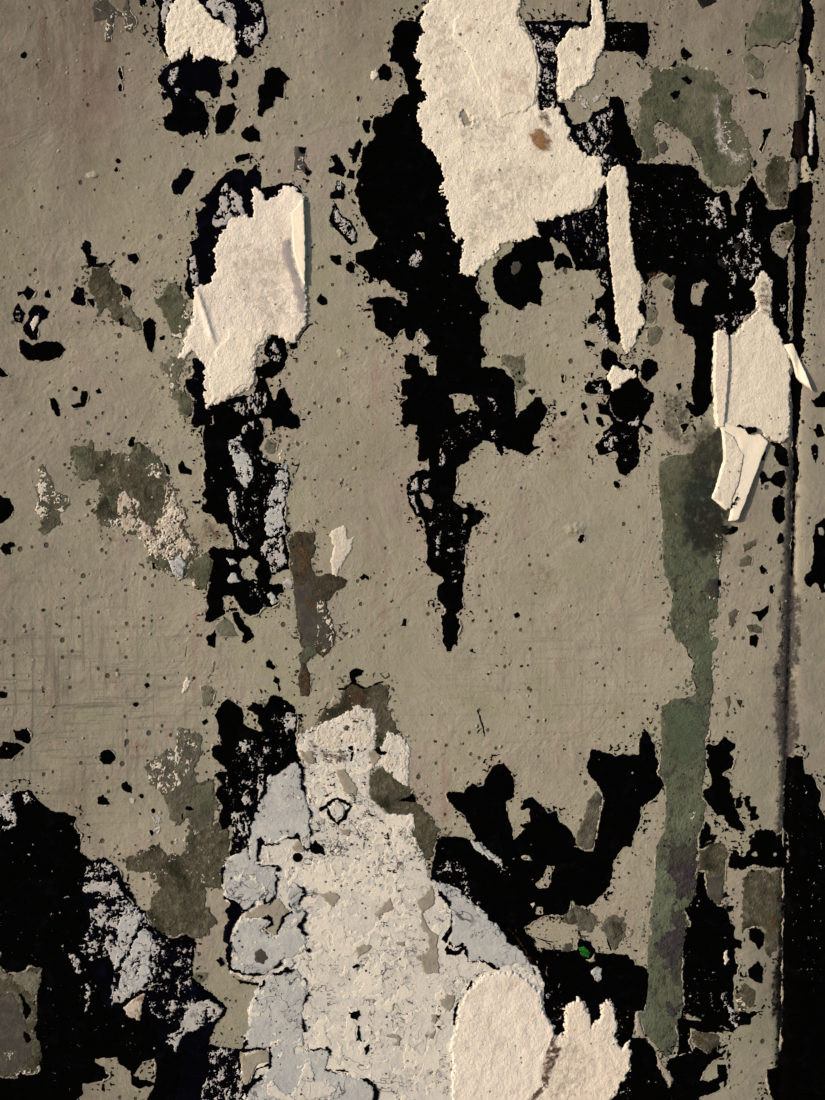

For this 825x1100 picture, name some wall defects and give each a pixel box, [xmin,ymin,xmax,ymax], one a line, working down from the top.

peeling [696,0,718,9]
peeling [91,0,291,150]
peeling [746,86,769,99]
peeling [328,0,556,653]
peeling [492,182,665,478]
peeling [63,146,370,697]
peeling [759,439,789,544]
peeling [731,539,767,575]
peeling [722,609,741,637]
peeling [746,585,774,648]
peeling [121,781,144,804]
peeling [149,808,162,836]